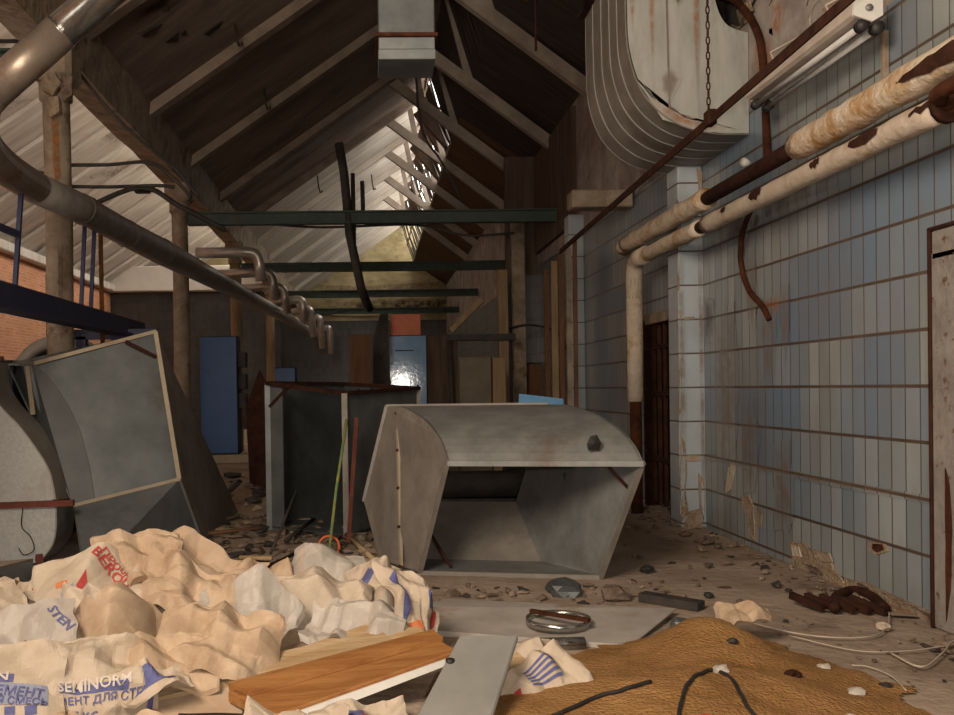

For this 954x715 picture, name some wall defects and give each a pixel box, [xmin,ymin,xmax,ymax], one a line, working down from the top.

spalling [790,541,930,625]